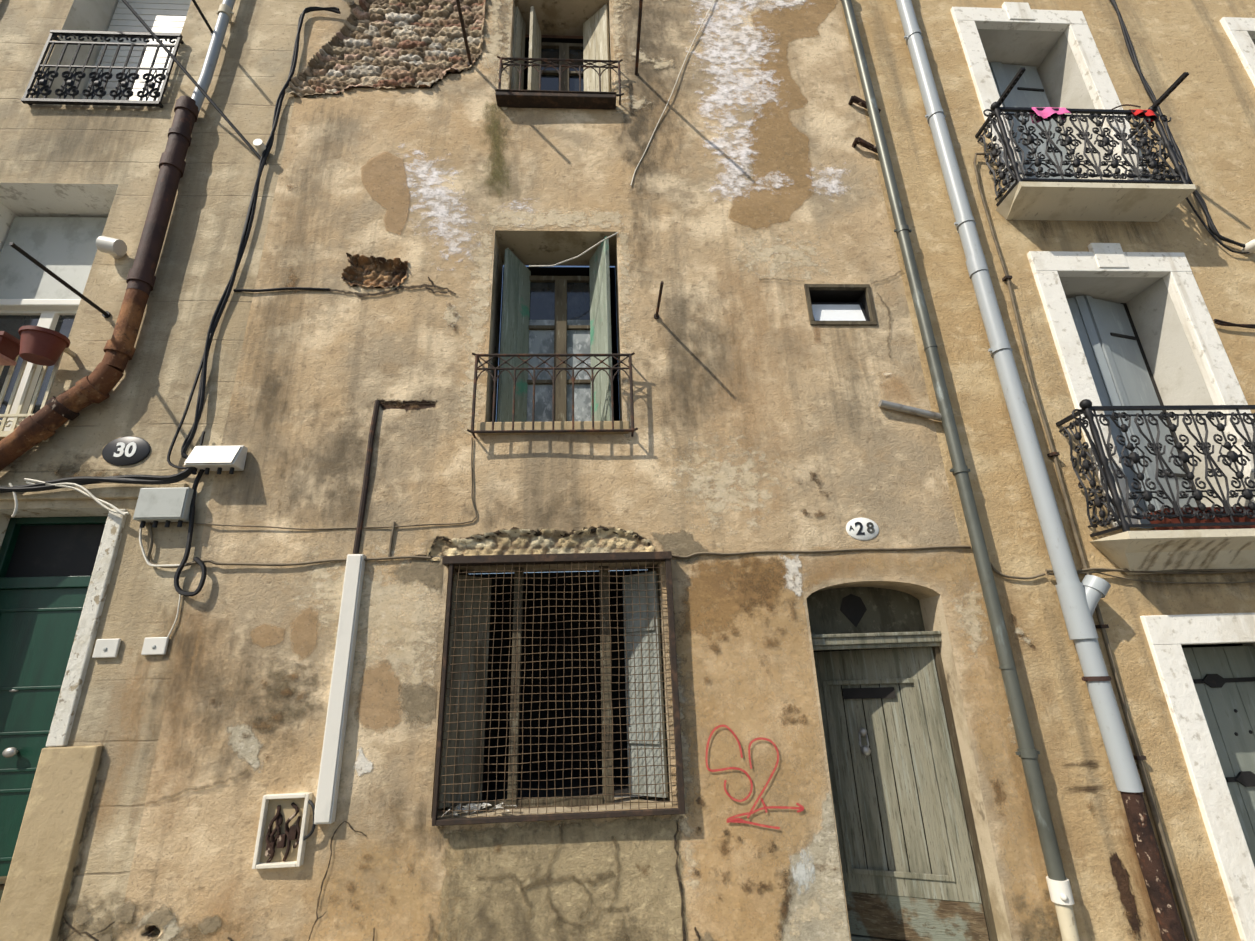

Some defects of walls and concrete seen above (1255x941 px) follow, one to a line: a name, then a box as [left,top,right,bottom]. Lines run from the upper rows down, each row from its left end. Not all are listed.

flaking render [285,0,504,98]
leakage [614,0,671,138]
leakage [693,0,846,229]
efflorescence [406,150,470,258]
spalling [341,253,408,290]
peeling [227,547,345,770]
spalling [354,525,655,730]
leakage [677,556,787,652]
crack [59,730,115,941]
crack [152,771,248,802]
crack [308,821,367,941]
crack [428,816,700,941]